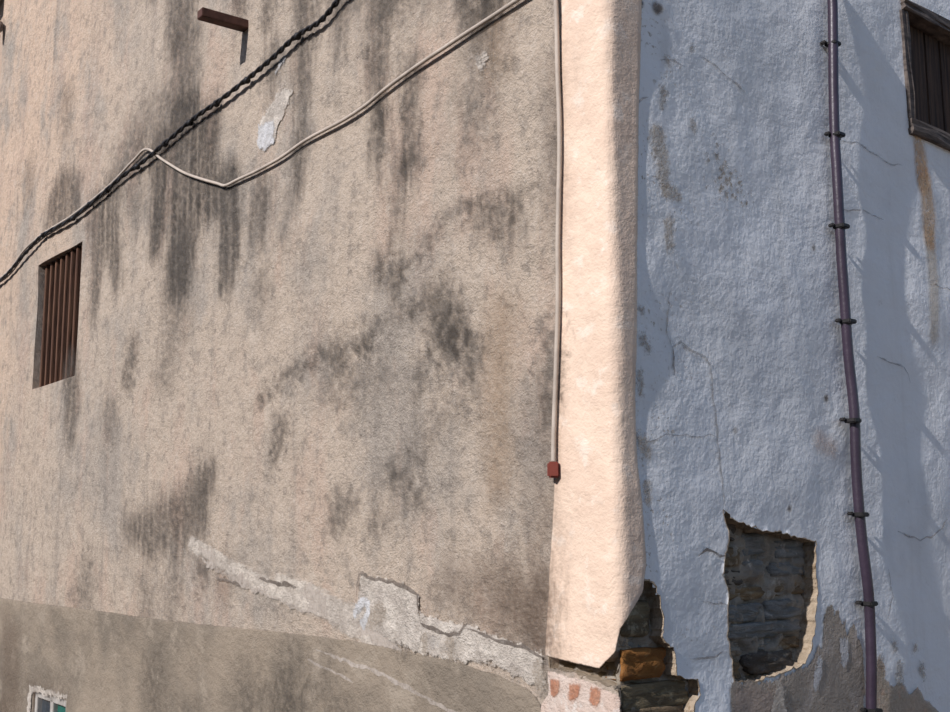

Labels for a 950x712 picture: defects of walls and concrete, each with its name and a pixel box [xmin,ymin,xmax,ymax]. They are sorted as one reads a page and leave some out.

damp [91,181,118,311]
damp [149,87,266,300]
spalling [256,87,293,151]
damp [294,121,304,188]
spalling [475,50,488,72]
crack [641,346,725,496]
damp [133,467,390,648]
spalling [351,575,701,712]
spalling [723,510,938,712]